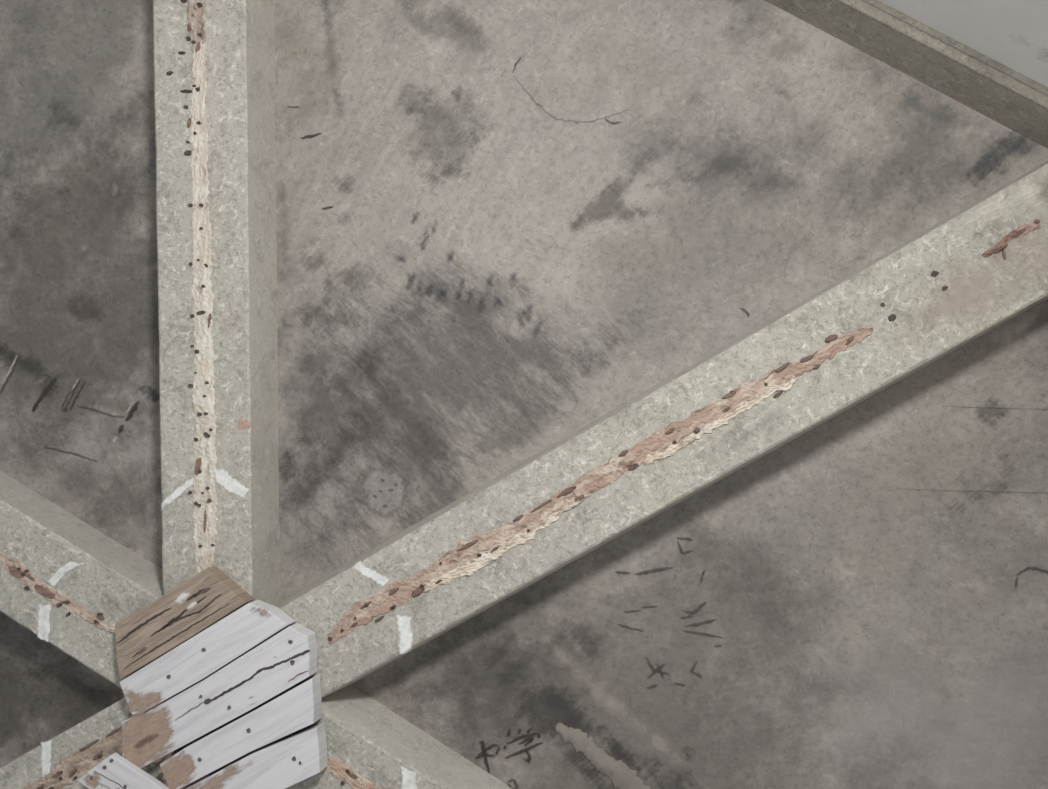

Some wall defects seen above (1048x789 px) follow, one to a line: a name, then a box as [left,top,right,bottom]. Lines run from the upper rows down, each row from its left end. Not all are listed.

spalling [178,0,219,574]
spalling [327,327,873,645]